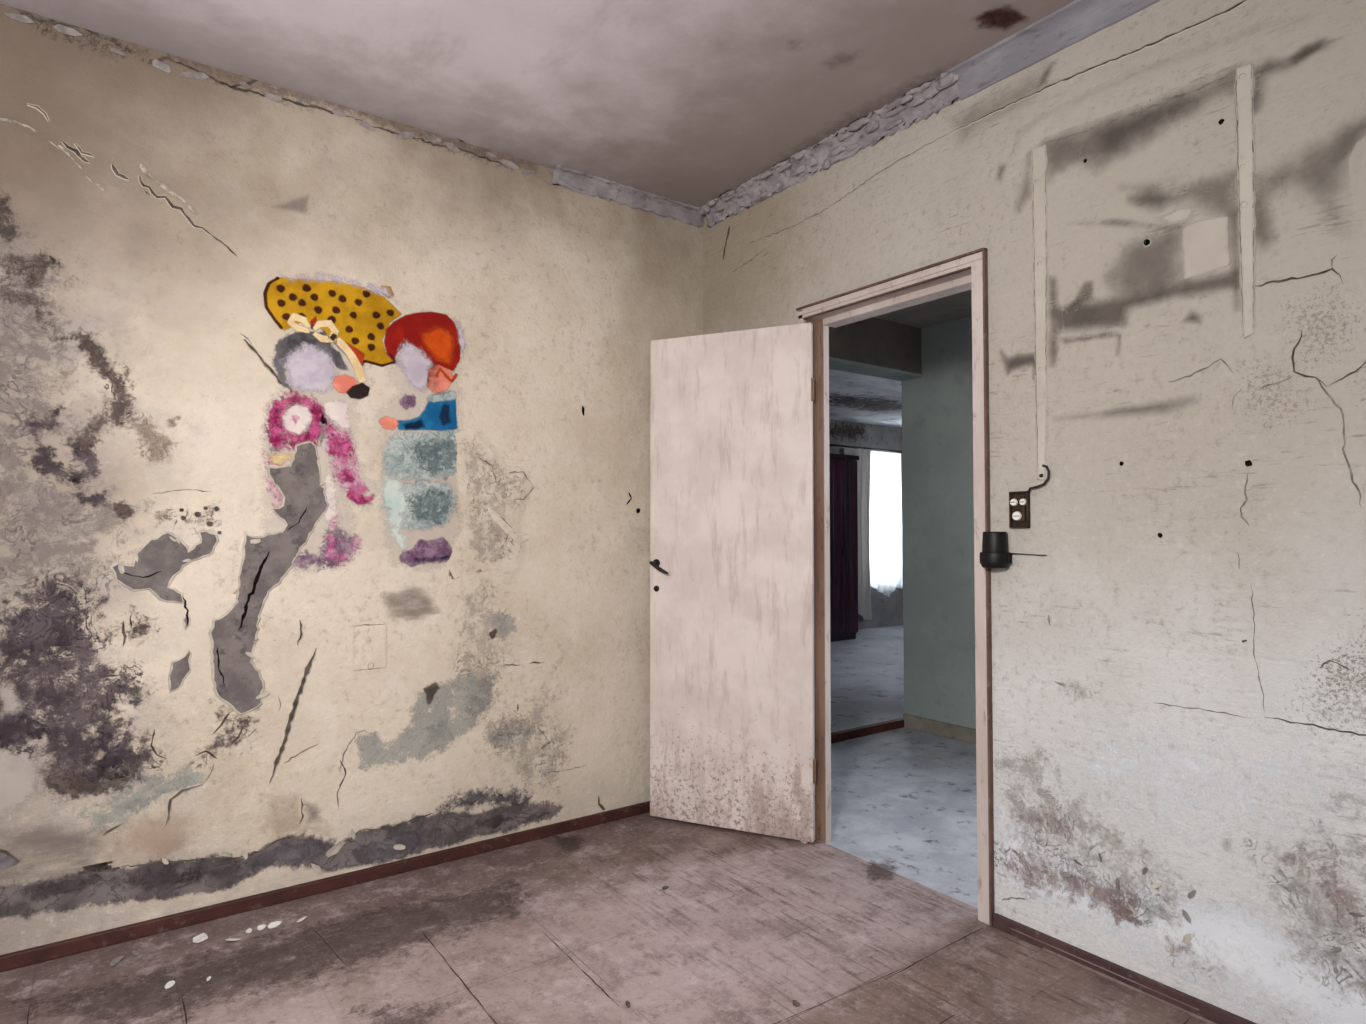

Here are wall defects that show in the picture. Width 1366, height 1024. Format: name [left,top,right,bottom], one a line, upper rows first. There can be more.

crack [0,103,237,256]
crack [1258,255,1343,287]
leakage [0,197,179,800]
crack [1170,329,1366,506]
peeling [80,441,330,833]
crack [269,620,318,783]
peeling [337,609,586,807]
leakage [437,788,532,814]
leakage [12,883,528,1024]
efflorescence [996,808,1366,1024]